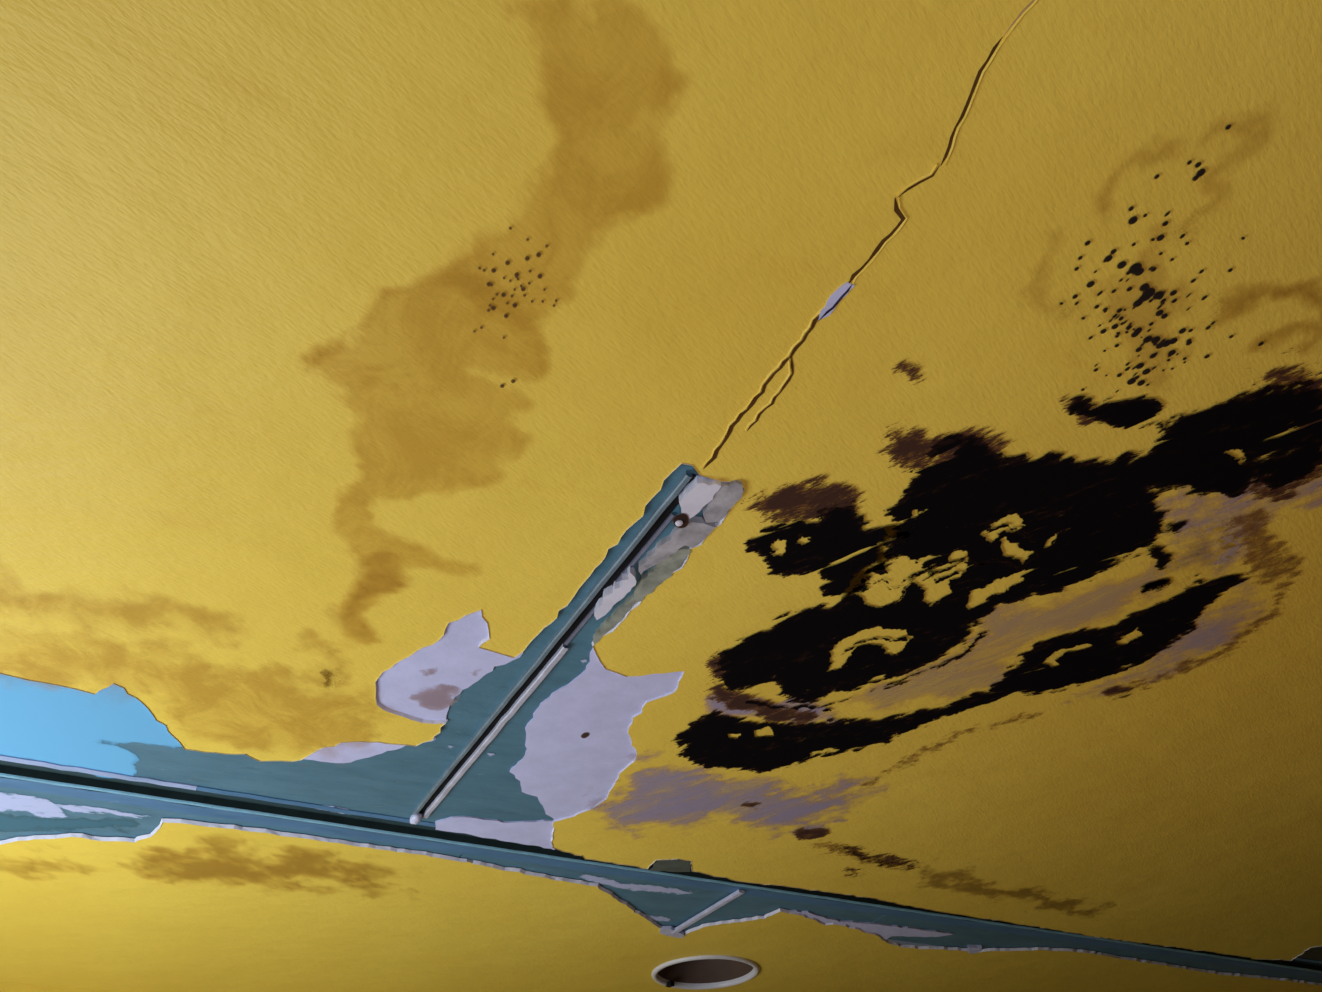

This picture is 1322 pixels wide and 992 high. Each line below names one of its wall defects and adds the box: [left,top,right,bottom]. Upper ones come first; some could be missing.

leakage [478,238,558,318]
crack [701,0,1039,469]
mould [1187,160,1206,181]
peeling [0,463,1322,986]
mould [590,211,1322,878]